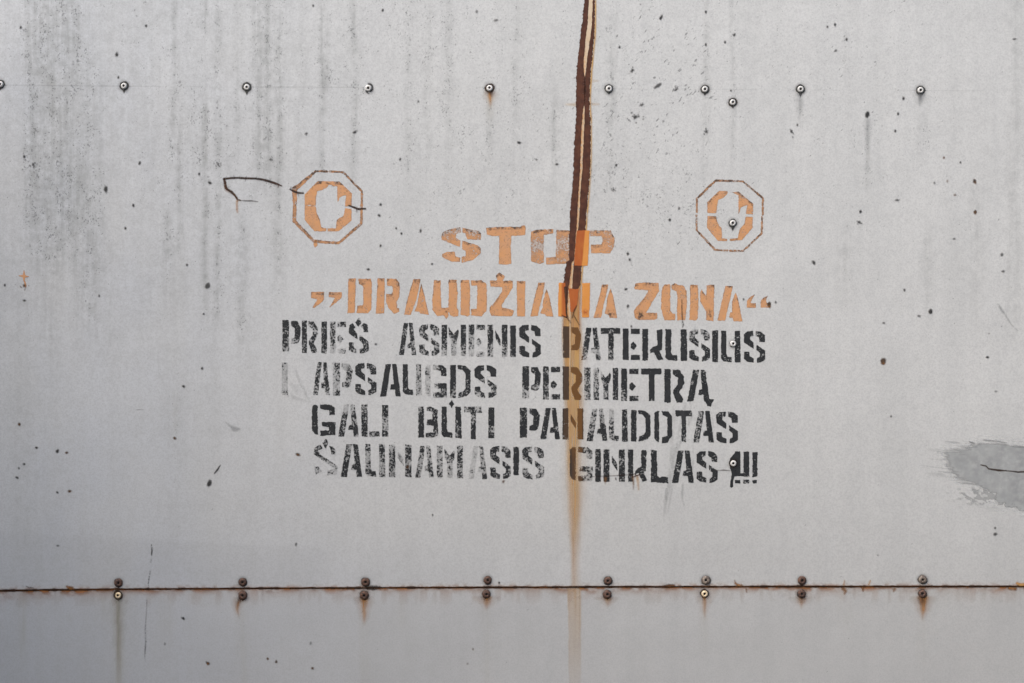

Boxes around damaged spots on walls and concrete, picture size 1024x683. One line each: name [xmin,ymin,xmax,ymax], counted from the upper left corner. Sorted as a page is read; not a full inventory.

crack [223,177,304,202]
corrosion [562,266,583,449]
peeling [946,442,1024,511]
corrosion [0,582,1024,612]